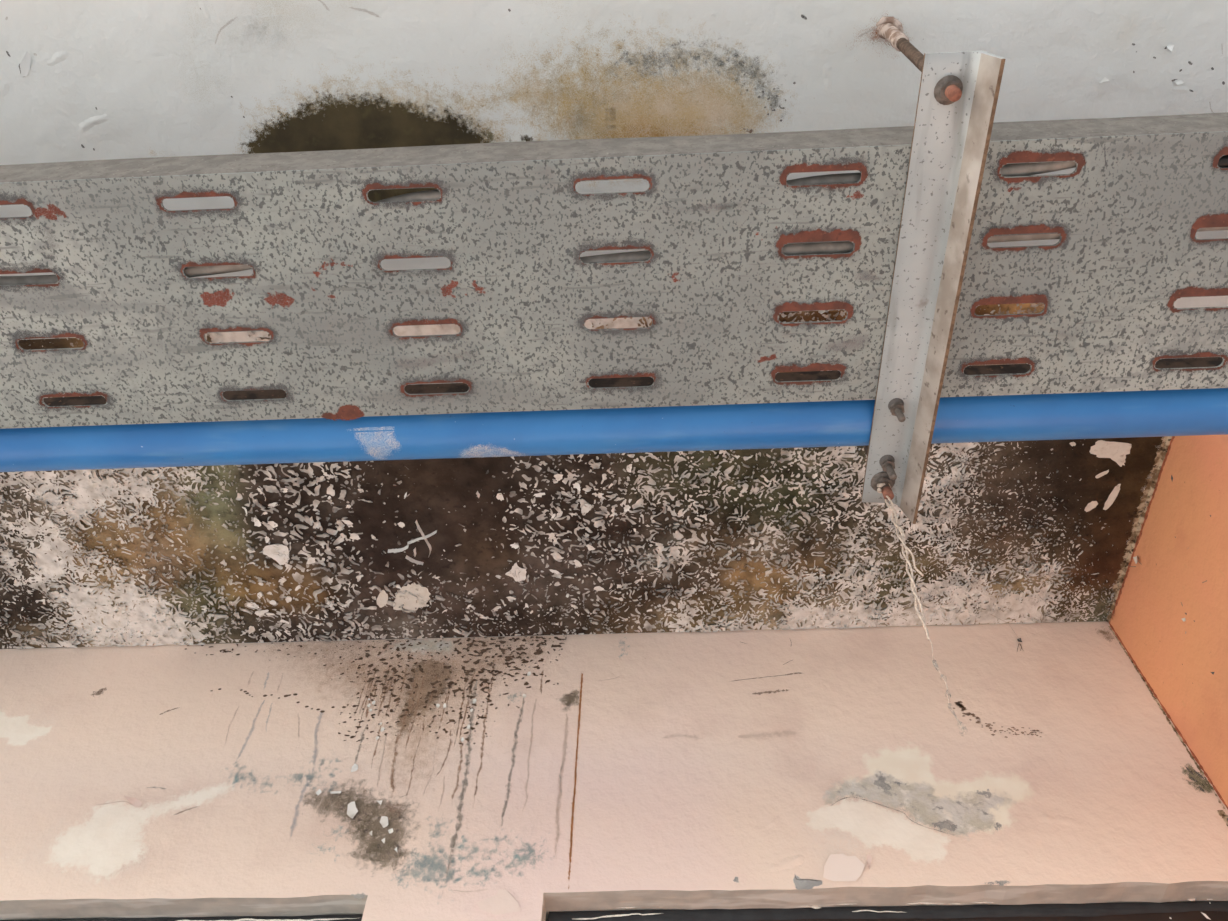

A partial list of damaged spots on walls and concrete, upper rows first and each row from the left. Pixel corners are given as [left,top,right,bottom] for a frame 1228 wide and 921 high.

leakage [174,0,815,154]
leakage [368,188,437,202]
leakage [19,338,84,350]
leakage [205,331,271,343]
leakage [393,324,460,336]
leakage [584,317,652,329]
leakage [778,310,847,322]
leakage [0,436,1165,904]
peeling [0,701,87,759]
corrosion [568,671,583,889]
peeling [1,781,236,903]
peeling [782,741,1038,890]